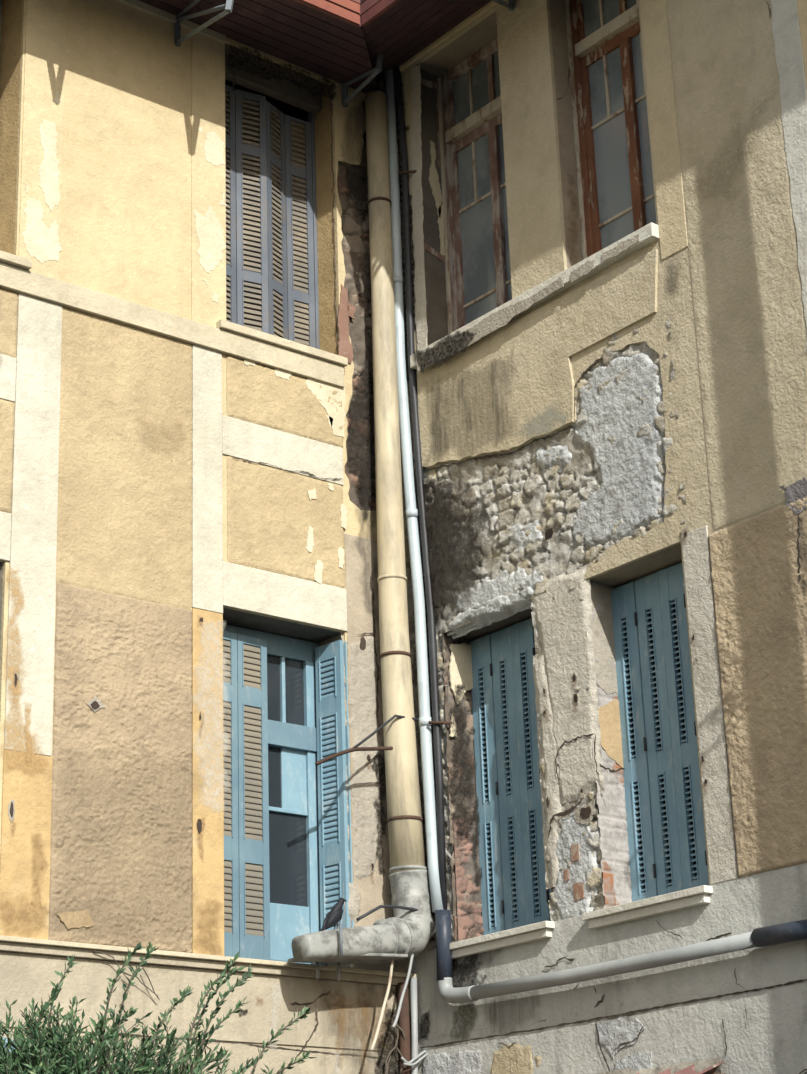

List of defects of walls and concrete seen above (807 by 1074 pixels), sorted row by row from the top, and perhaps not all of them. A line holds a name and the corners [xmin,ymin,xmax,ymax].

peeling [22,118,62,264]
peeling [196,126,225,166]
peeling [194,192,227,304]
flaking render [305,87,376,530]
peeling [275,368,292,380]
peeling [306,525,324,584]
flaking render [403,326,688,943]
flaking render [423,903,436,952]
crack [119,991,380,1058]
crack [420,957,807,1071]